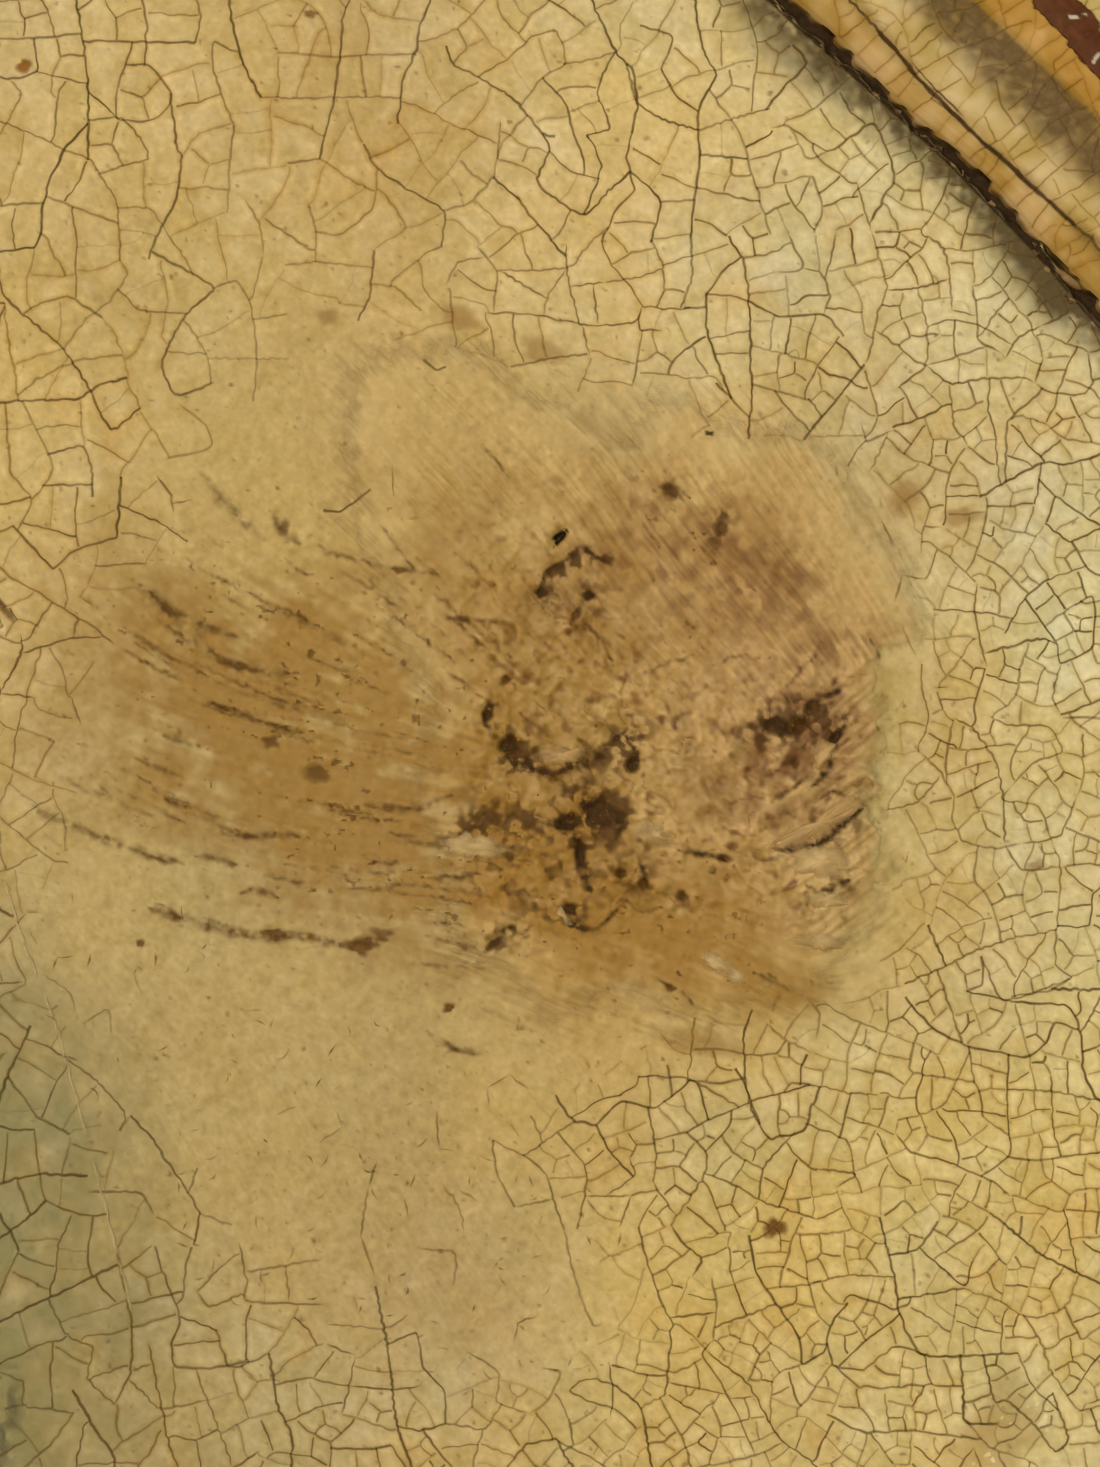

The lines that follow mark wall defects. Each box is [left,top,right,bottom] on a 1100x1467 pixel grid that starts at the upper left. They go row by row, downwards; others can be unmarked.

crack [0,0,141,430]
crack [493,0,748,256]
crack [765,0,1100,328]
peeling [1032,0,1100,79]
crack [663,236,831,439]
crack [959,403,1100,664]
leakage [139,592,798,1001]
crack [555,1010,850,1199]
crack [905,925,1100,1160]
crack [331,1286,443,1467]
crack [737,1217,1069,1452]
crack [989,1209,1100,1284]